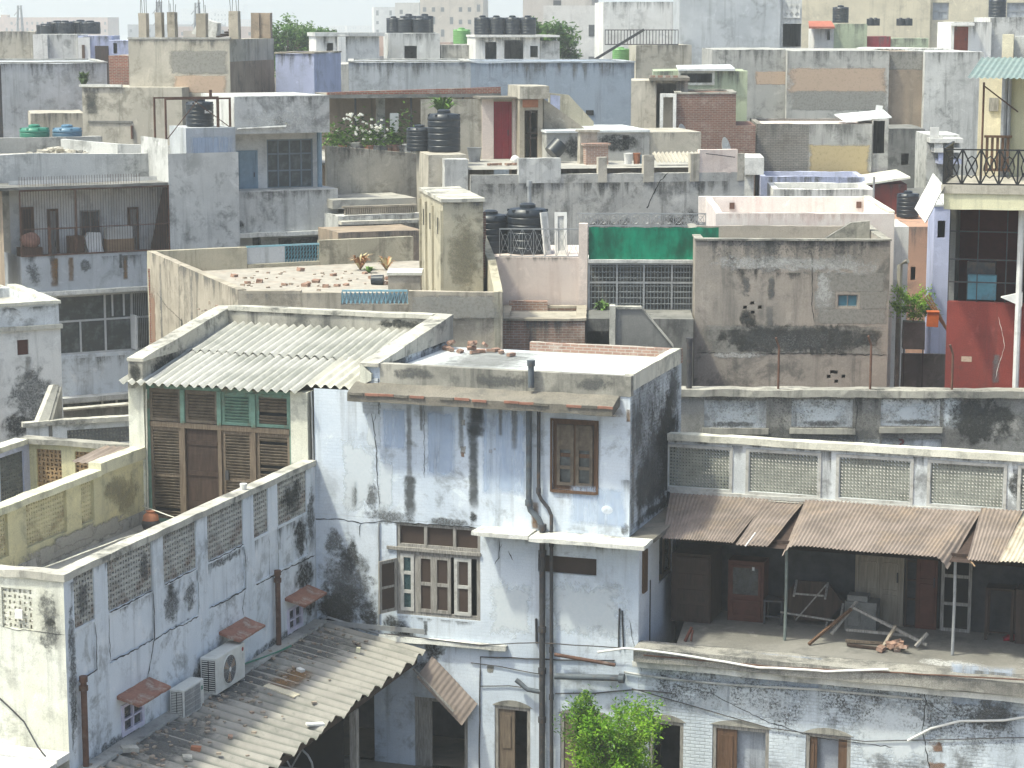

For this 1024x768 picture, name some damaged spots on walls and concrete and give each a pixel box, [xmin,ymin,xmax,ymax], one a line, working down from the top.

damp [704,241,882,358]
mould [6,359,54,437]
crack [316,402,474,535]
damp [431,407,486,527]
damp [499,409,517,440]
damp [621,367,680,534]
damp [708,389,1015,467]
mould [164,582,195,627]
crack [73,541,314,743]
damp [279,474,442,669]
mould [823,686,889,721]
damp [905,694,1014,747]